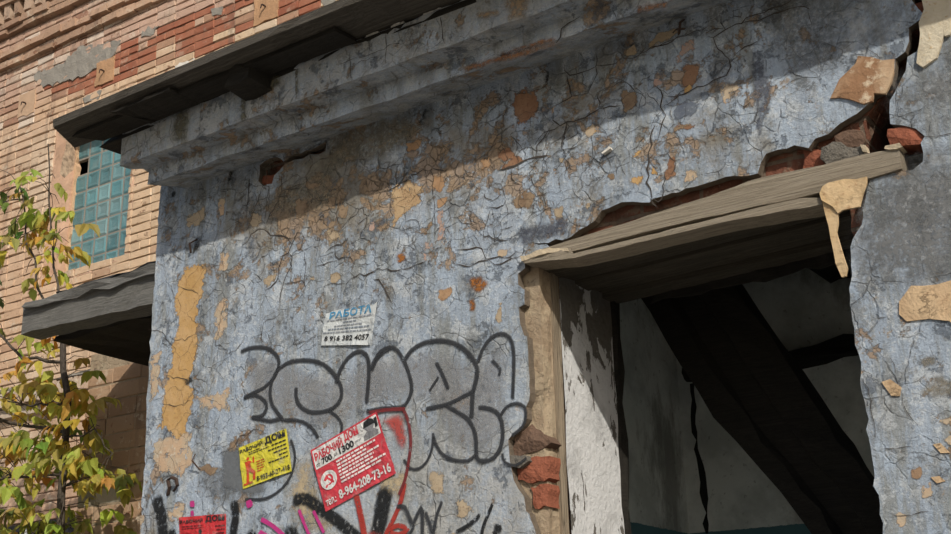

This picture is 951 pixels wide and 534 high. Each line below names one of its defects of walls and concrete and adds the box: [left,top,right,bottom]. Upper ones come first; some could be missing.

crack [330,12,462,82]
peeling [830,56,895,105]
peeling [909,0,951,100]
crack [368,168,446,217]
crack [452,0,812,267]
spalling [803,149,825,169]
spalling [887,126,924,157]
crack [216,179,423,353]
peeling [149,263,230,477]
crack [863,380,910,449]
spalling [513,424,562,509]
crack [690,383,709,534]